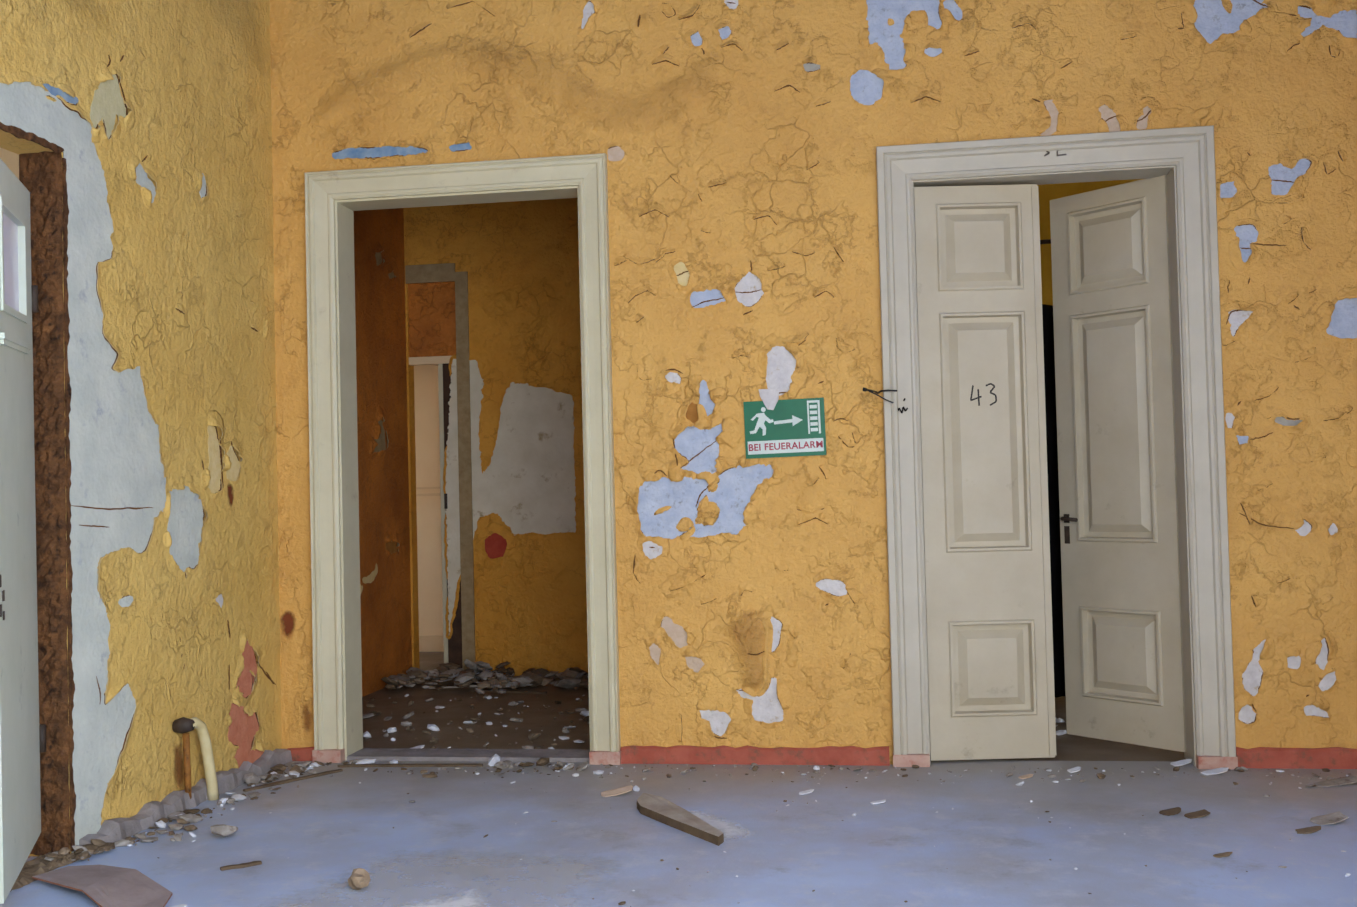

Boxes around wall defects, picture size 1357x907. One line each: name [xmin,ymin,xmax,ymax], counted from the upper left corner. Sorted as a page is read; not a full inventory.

peeling [850,0,964,111]
peeling [1184,0,1357,47]
peeling [1261,154,1319,195]
flaking render [0,55,243,853]
peeling [628,368,782,570]
spalling [214,587,276,769]
peeling [696,603,793,739]
peeling [1234,630,1339,729]